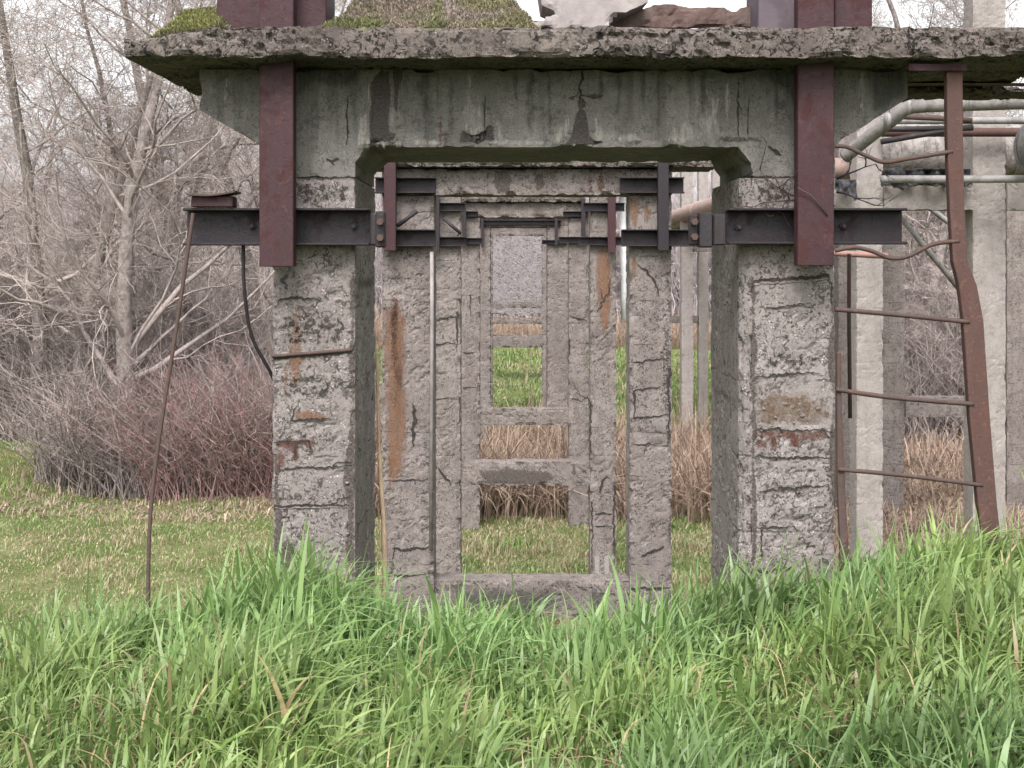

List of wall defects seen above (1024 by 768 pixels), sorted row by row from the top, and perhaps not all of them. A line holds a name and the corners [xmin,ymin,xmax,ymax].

crack [573,70,603,105]
damp [358,115,401,146]
crack [737,79,790,190]
corrosion [597,251,610,331]
crack [638,264,659,296]
corrosion [385,297,405,484]
corrosion [756,430,826,450]